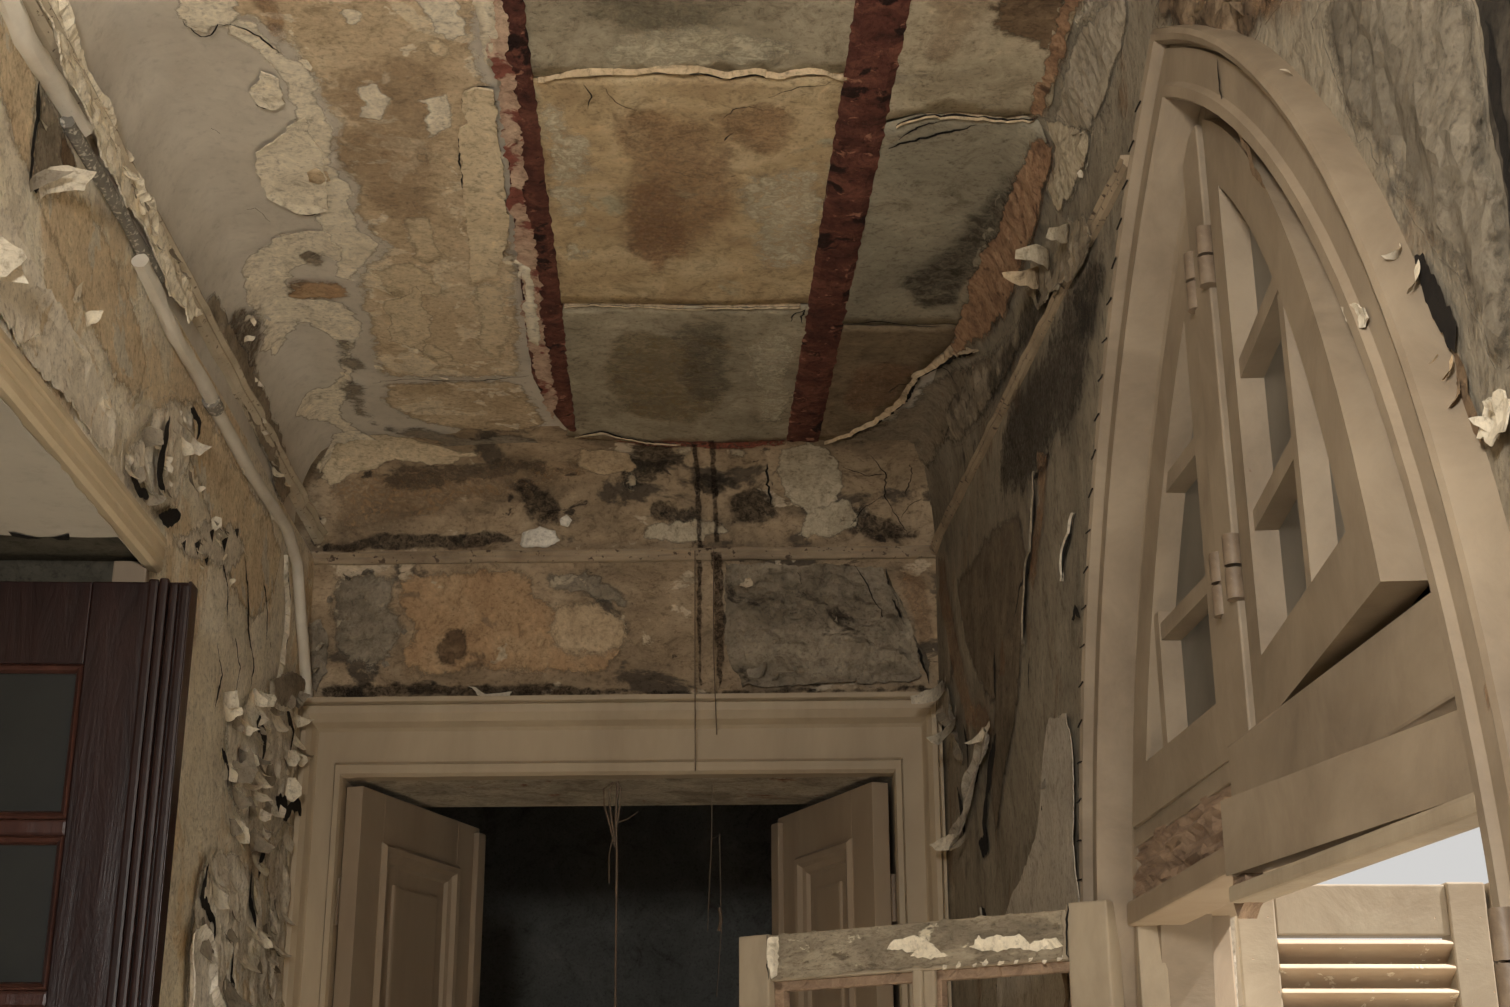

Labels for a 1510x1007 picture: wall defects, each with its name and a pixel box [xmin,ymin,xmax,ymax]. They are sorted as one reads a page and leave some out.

leakage [596,0,796,68]
crack [889,112,1037,149]
flaking render [845,0,1129,468]
flaking render [0,0,544,620]
leakage [323,458,585,552]
leakage [621,444,692,490]
leakage [650,501,701,523]
peeling [777,442,858,538]
leakage [841,505,916,541]
flaking render [326,567,627,696]
peeling [184,688,314,1007]
peeling [767,713,1080,1007]